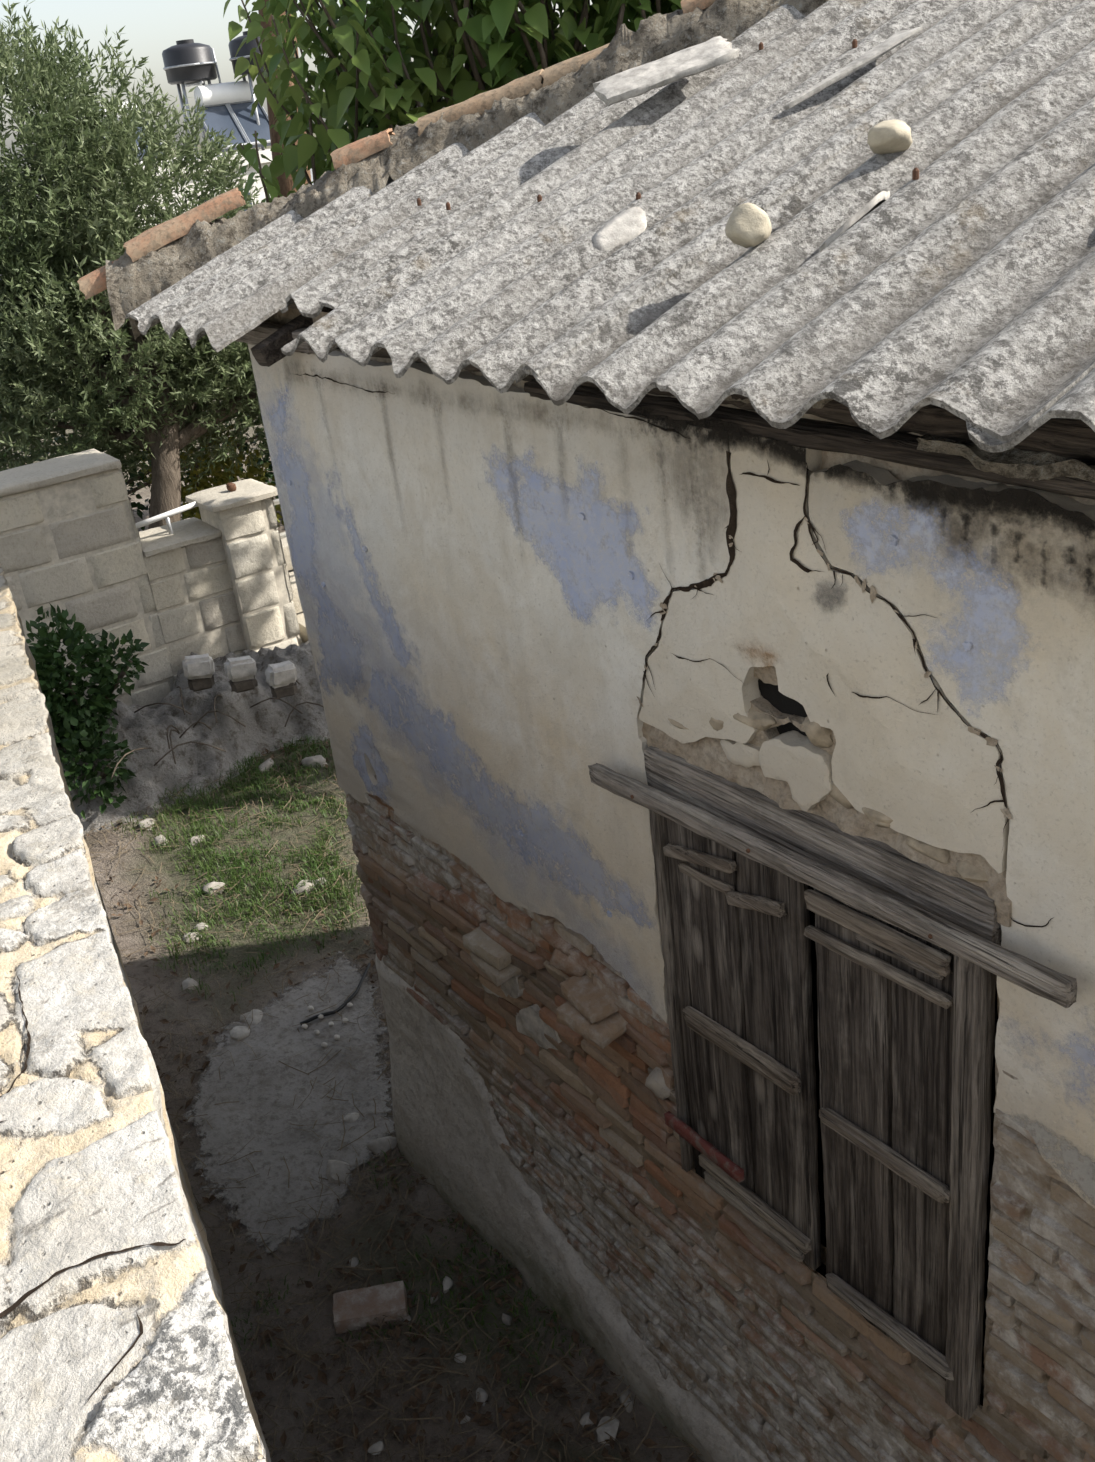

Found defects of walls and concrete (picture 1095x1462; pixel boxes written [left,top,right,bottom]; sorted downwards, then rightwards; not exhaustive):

crack [579,405,690,439]
damp [637,405,1095,595]
crack [636,451,1012,850]
spalling [642,666,1012,927]
flaking render [346,775,1095,1462]
crack [0,1228,204,1318]
crack [87,1312,143,1402]